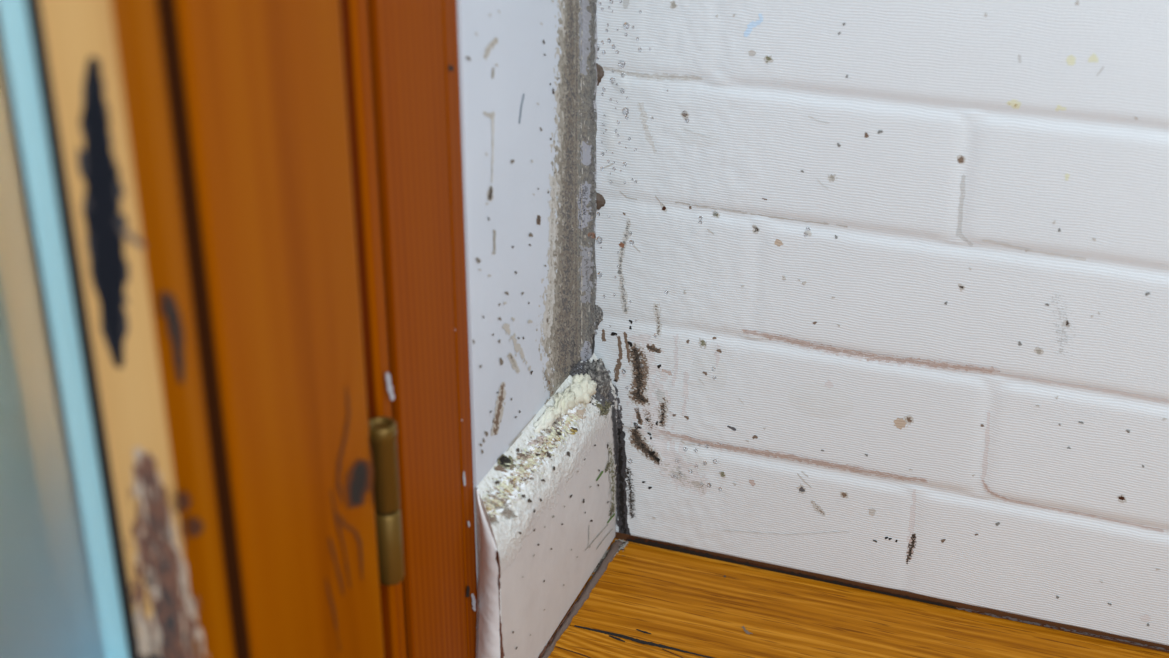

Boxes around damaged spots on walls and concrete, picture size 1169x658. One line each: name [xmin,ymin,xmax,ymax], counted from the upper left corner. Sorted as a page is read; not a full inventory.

water stain [466,37,498,79]
water stain [476,111,496,277]
water stain [492,0,597,397]
water stain [479,382,521,454]
water stain [519,213,1169,651]